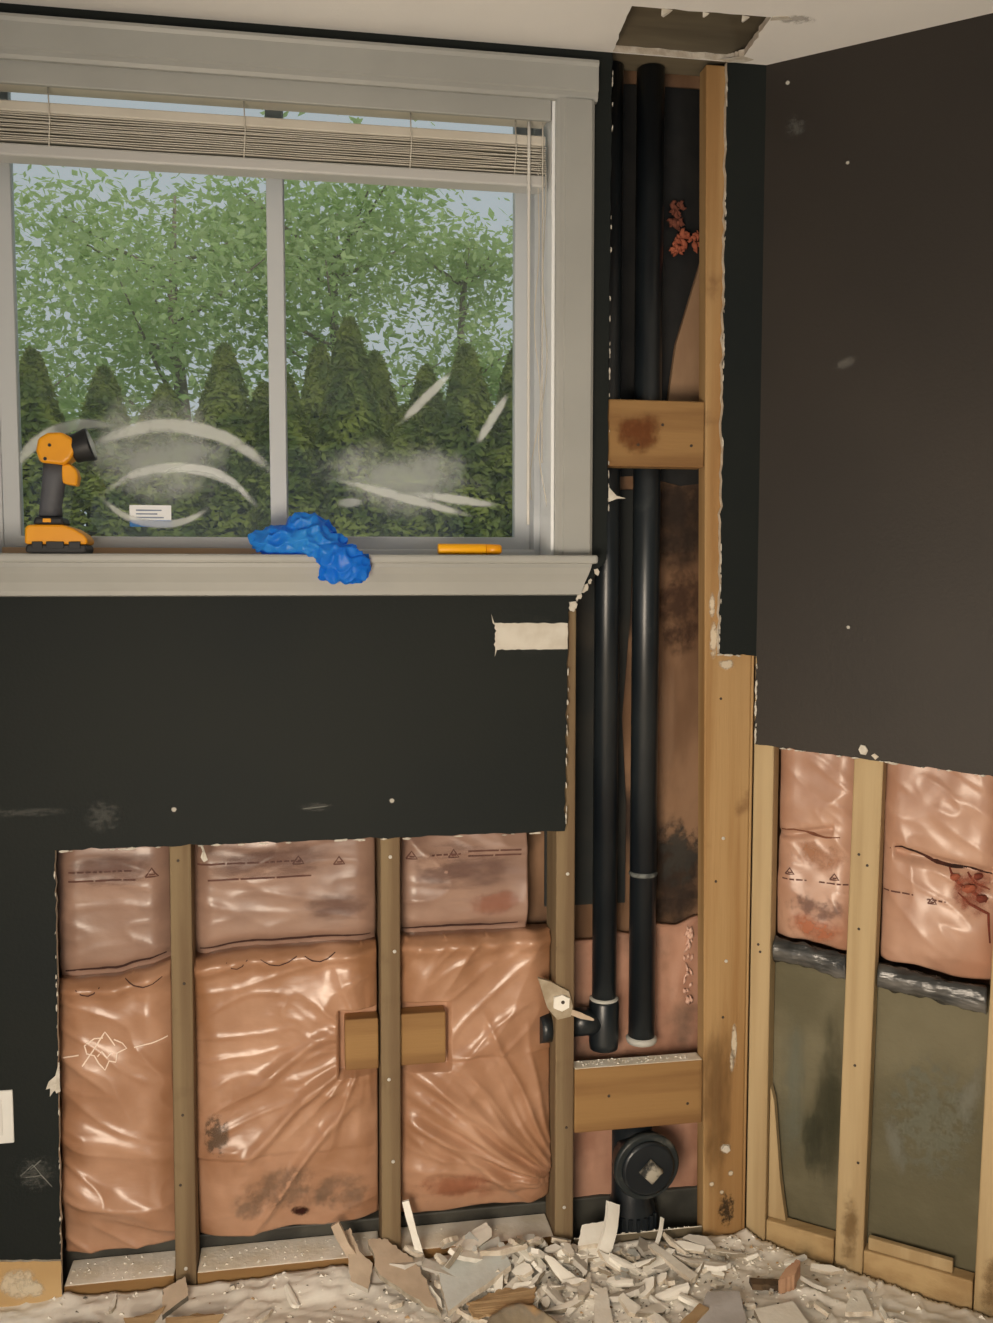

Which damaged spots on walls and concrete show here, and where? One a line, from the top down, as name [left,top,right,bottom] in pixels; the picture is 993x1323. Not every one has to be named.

water stain [660,483,699,562]
water stain [659,584,699,649]
water stain [656,825,698,923]
water stain [806,1075,839,1161]
water stain [846,1213,856,1251]